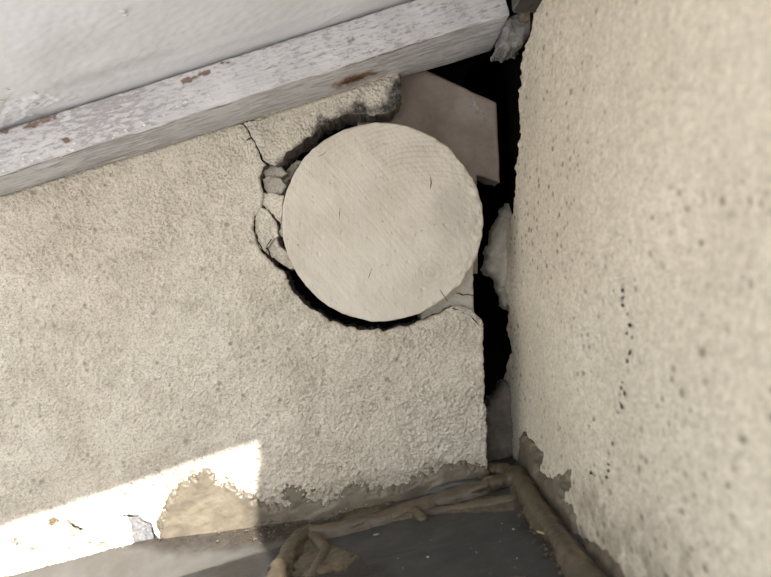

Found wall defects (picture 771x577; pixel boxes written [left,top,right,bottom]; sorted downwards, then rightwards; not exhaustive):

rust [337,72,376,88]
crack [243,117,269,166]
crack [253,216,278,266]
spalling [128,515,156,542]